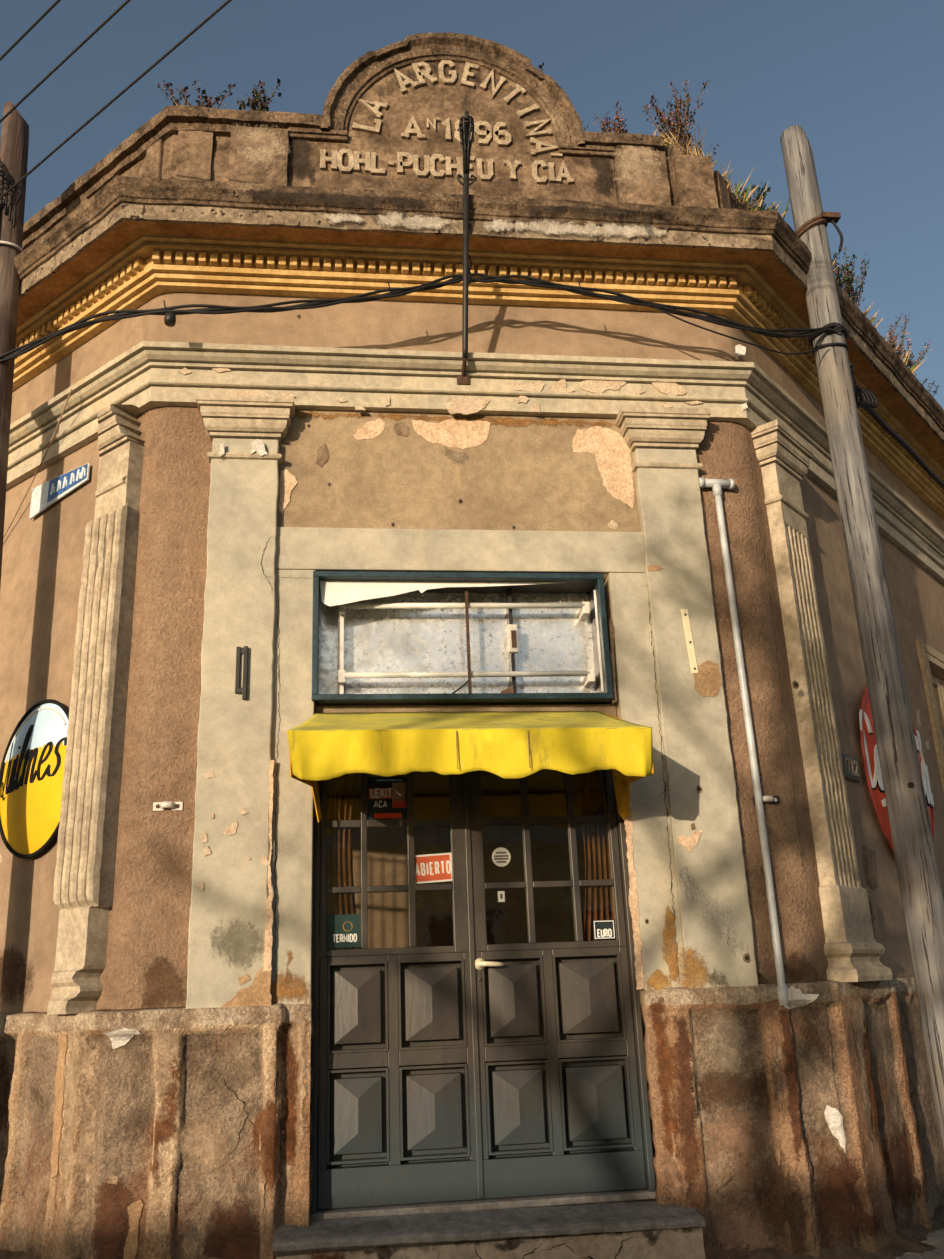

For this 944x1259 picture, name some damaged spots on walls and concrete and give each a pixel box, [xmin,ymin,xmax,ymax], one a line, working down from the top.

peeling [278,470,298,515]
peeling [337,396,491,463]
peeling [572,426,634,508]
leakage [647,907,726,990]
leakage [0,1059,11,1131]
leakage [59,1029,131,1259]
peeling [105,1028,142,1049]
leakage [150,1030,184,1187]
leakage [252,951,311,1189]
flaking render [824,1105,846,1153]
leakage [754,1123,927,1256]
crack [522,1237,632,1259]